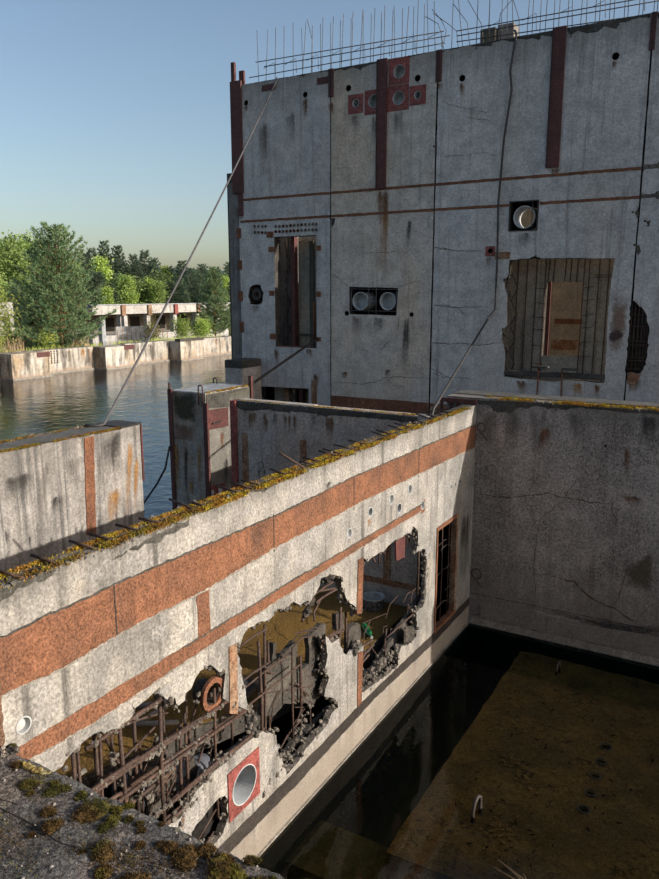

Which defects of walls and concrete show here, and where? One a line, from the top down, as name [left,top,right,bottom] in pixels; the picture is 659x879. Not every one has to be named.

peeling [249,0,659,84]
rust [378,192,388,236]
spalling [632,191,659,227]
spalling [350,287,398,315]
spalling [625,301,650,386]
peeling [207,388,659,479]
spalling [0,424,476,698]
crack [481,477,637,636]
spalling [0,504,452,843]